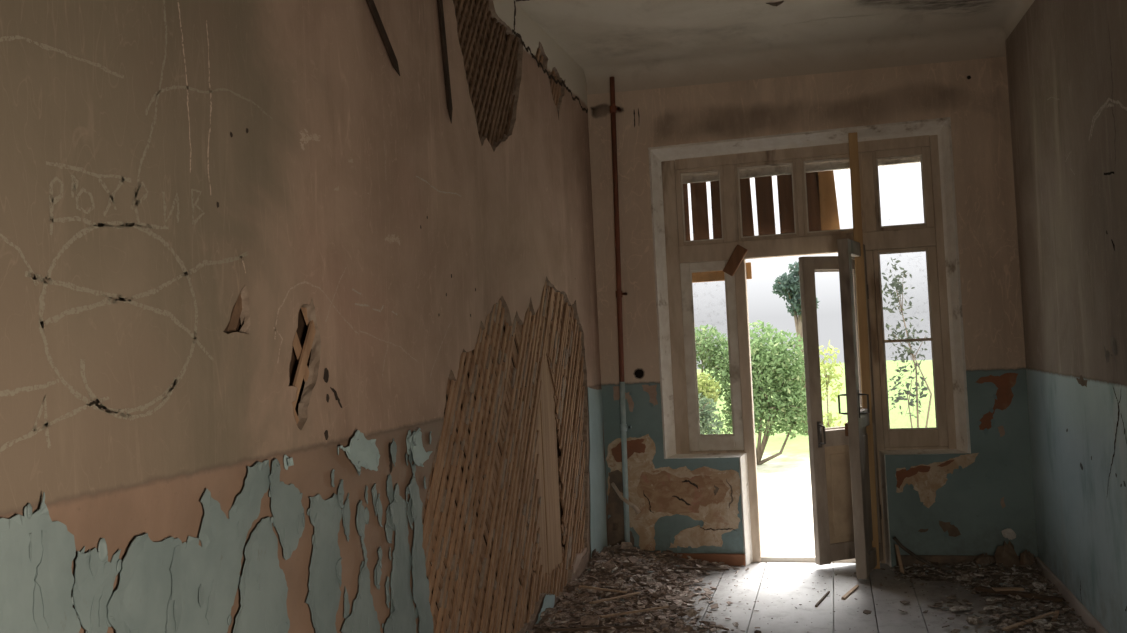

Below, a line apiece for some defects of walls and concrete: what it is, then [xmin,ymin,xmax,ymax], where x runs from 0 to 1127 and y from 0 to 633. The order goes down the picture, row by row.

flaking render [453,0,565,151]
crack [512,0,588,113]
flaking render [0,276,741,633]
peeling [896,453,979,508]
peeling [976,373,1018,435]
crack [1107,388,1127,493]